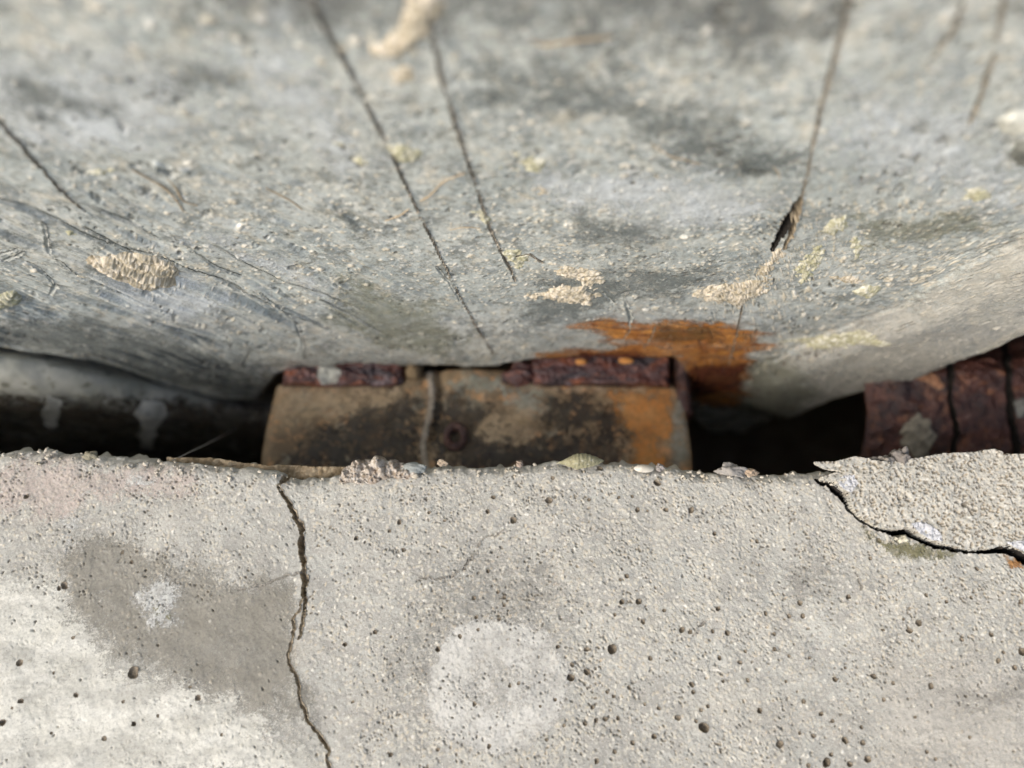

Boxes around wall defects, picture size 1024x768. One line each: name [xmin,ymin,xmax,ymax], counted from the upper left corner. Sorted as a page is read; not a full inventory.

crack [311,0,493,354]
crack [429,21,543,282]
crack [800,0,851,198]
rust [283,363,406,388]
rust [501,318,775,465]
rust [860,335,1024,459]
leakage [0,455,314,768]
crack [237,475,331,768]
crack [814,474,1024,565]